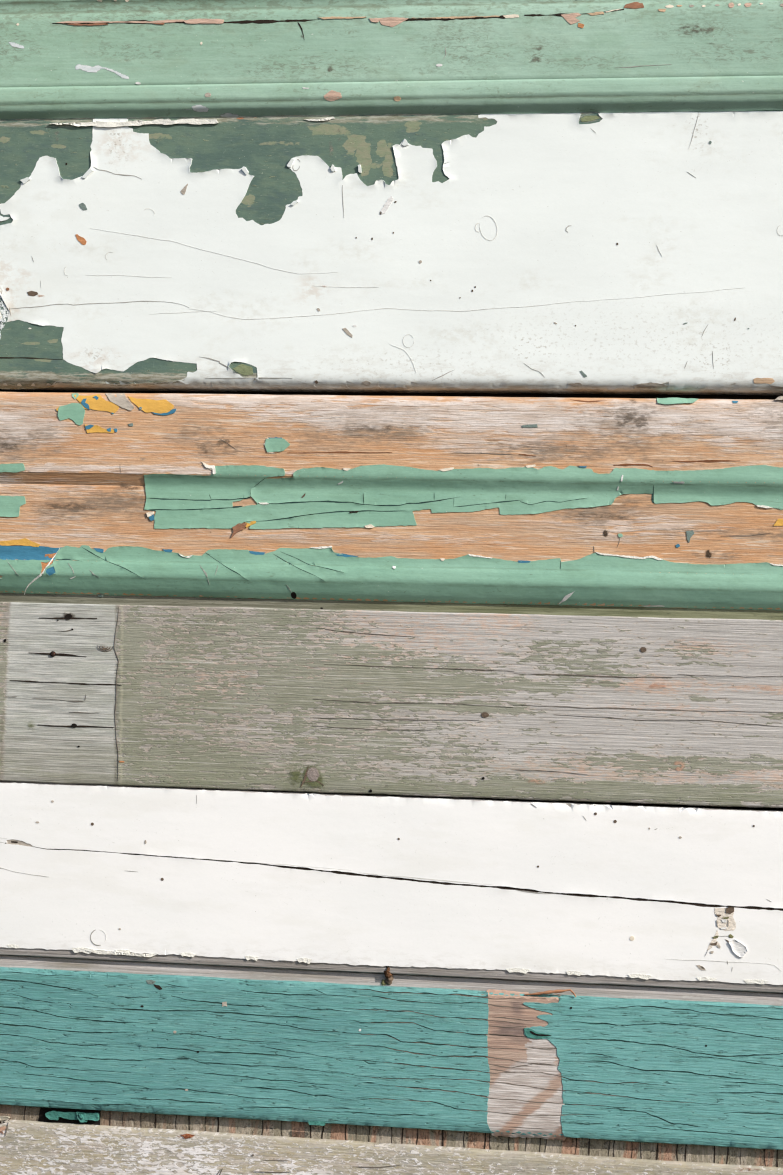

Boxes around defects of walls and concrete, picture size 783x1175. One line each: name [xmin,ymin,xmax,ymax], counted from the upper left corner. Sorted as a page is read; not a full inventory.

peeling [0,96,497,225]
peeling [0,312,197,433]
peeling [229,362,258,380]
peeling [0,437,783,611]
crack [1,838,783,911]
peeling [71,947,158,957]
crack [0,972,547,1173]
peeling [345,988,634,1140]
crack [546,1003,783,1167]